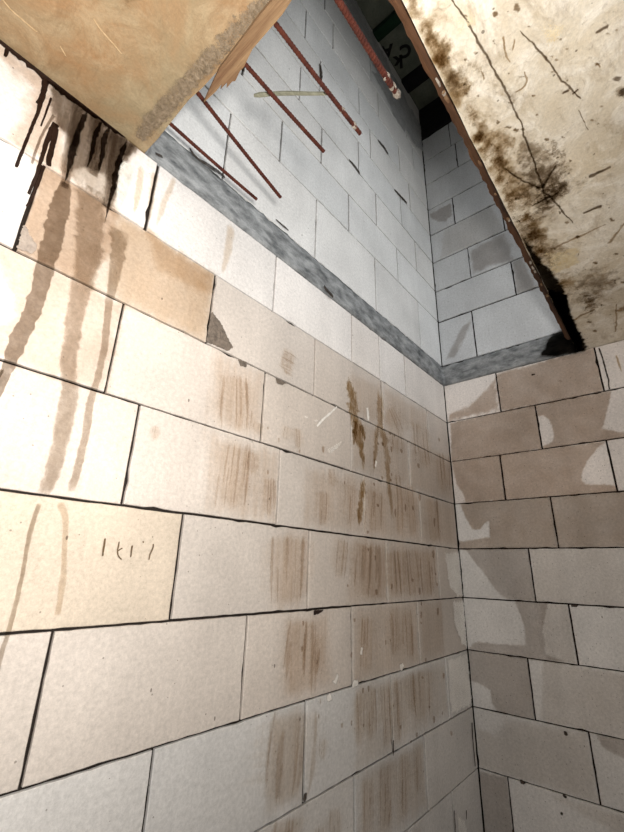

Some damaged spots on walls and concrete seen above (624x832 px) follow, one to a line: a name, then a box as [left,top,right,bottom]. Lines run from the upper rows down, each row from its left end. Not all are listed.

leakage [15,78,59,207]
leakage [65,112,87,180]
leakage [87,122,133,217]
spalling [196,91,282,198]
spalling [244,62,325,153]
spalling [274,21,362,136]
crack [452,0,573,223]
crack [521,32,588,129]